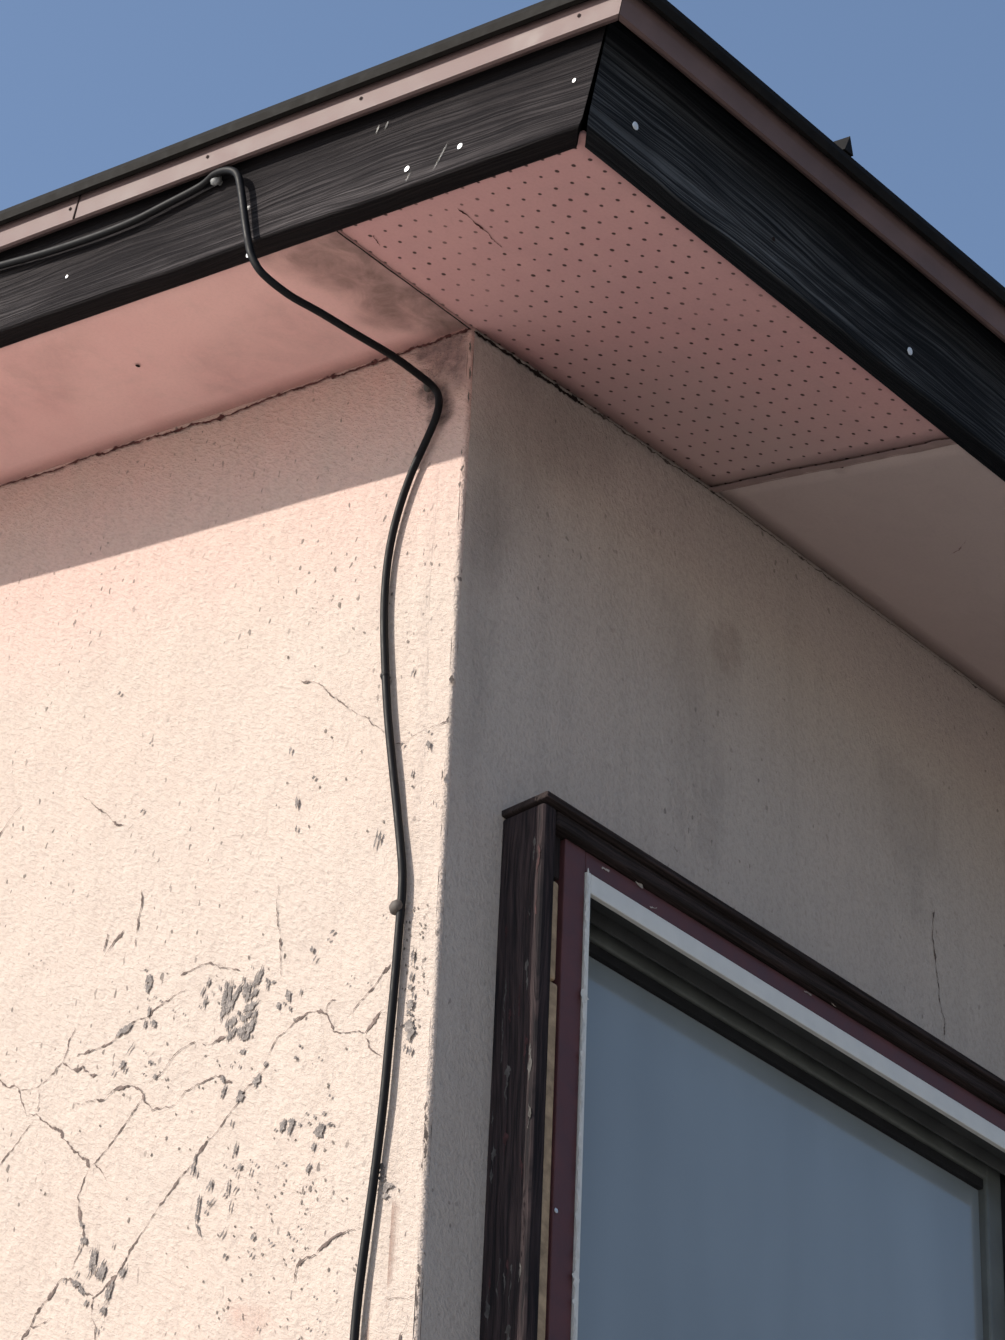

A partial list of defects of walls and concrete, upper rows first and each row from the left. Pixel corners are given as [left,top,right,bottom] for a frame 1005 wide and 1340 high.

crack [103,890,143,952]
crack [275,890,283,974]
peeling [111,969,184,1088]
peeling [198,956,307,1103]
crack [0,962,390,1340]
peeling [155,1083,347,1320]